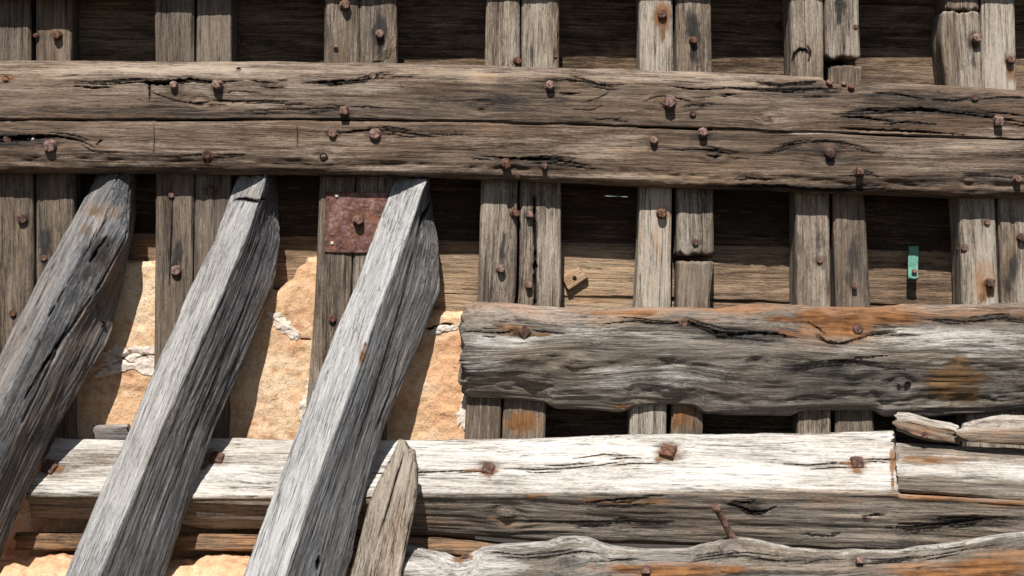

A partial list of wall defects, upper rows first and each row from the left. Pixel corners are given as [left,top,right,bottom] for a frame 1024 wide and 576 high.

rust [654,4,670,40]
crack [76,72,463,145]
crack [644,46,1024,192]
crack [472,155,591,169]
spalling [265,309,301,340]
crack [605,313,1024,371]
rust [766,310,912,336]
spalling [93,343,154,378]
rust [925,358,986,403]
crack [731,501,775,515]